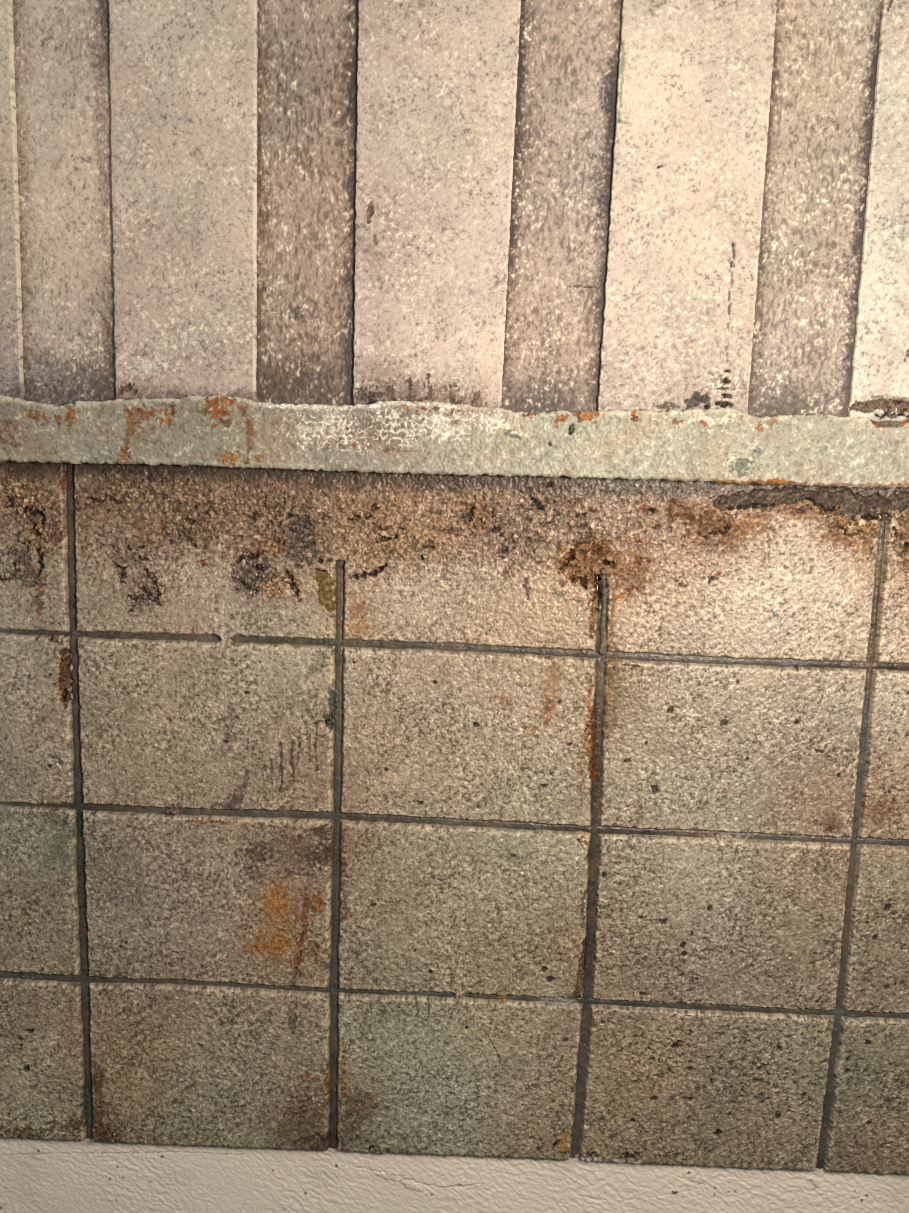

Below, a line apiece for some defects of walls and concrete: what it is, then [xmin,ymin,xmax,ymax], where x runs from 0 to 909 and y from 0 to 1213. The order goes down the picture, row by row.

rust [28,403,79,426]
rust [118,404,176,464]
rust [202,395,260,465]
spalling [849,394,909,428]
rust [576,524,662,781]
rust [244,874,326,975]